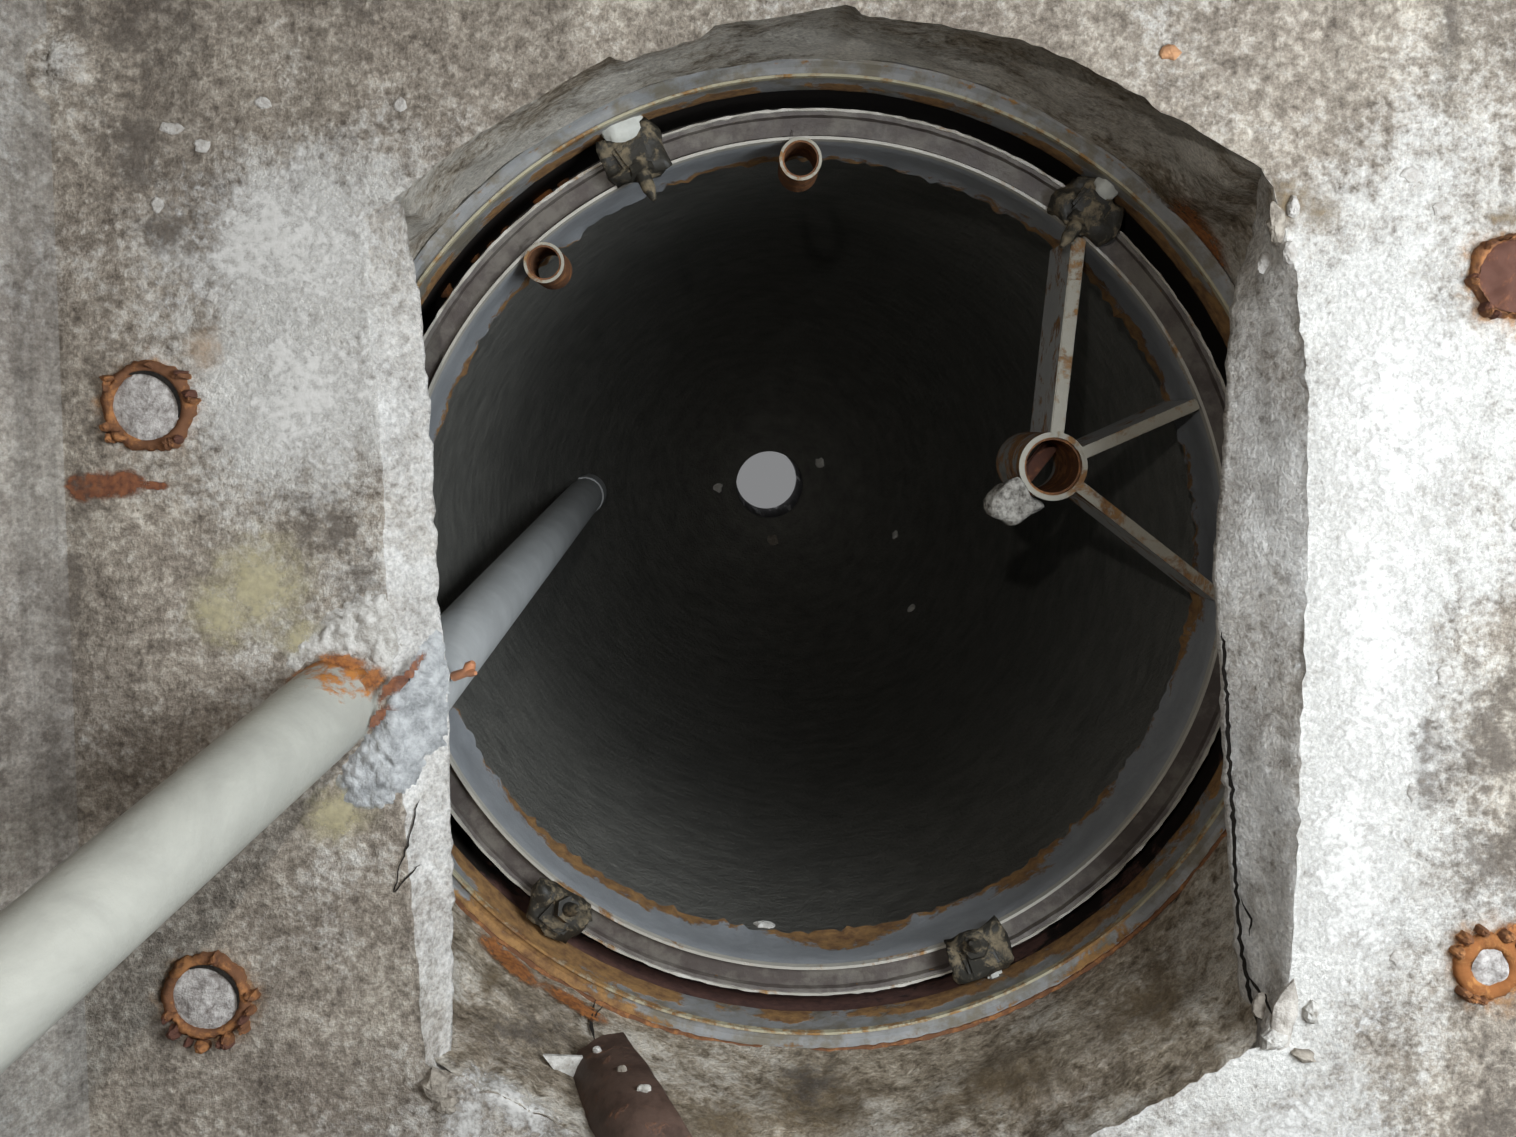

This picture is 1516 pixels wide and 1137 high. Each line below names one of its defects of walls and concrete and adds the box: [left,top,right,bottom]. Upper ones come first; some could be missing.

rust [1463,270,1514,326]
rust [172,370,202,405]
rust [95,421,128,443]
rust [161,434,185,451]
rust [65,470,168,502]
rust [320,654,426,729]
crack [1220,632,1272,1023]
rust [1449,924,1516,969]
rust [151,980,262,1054]
rust [1454,985,1516,1006]